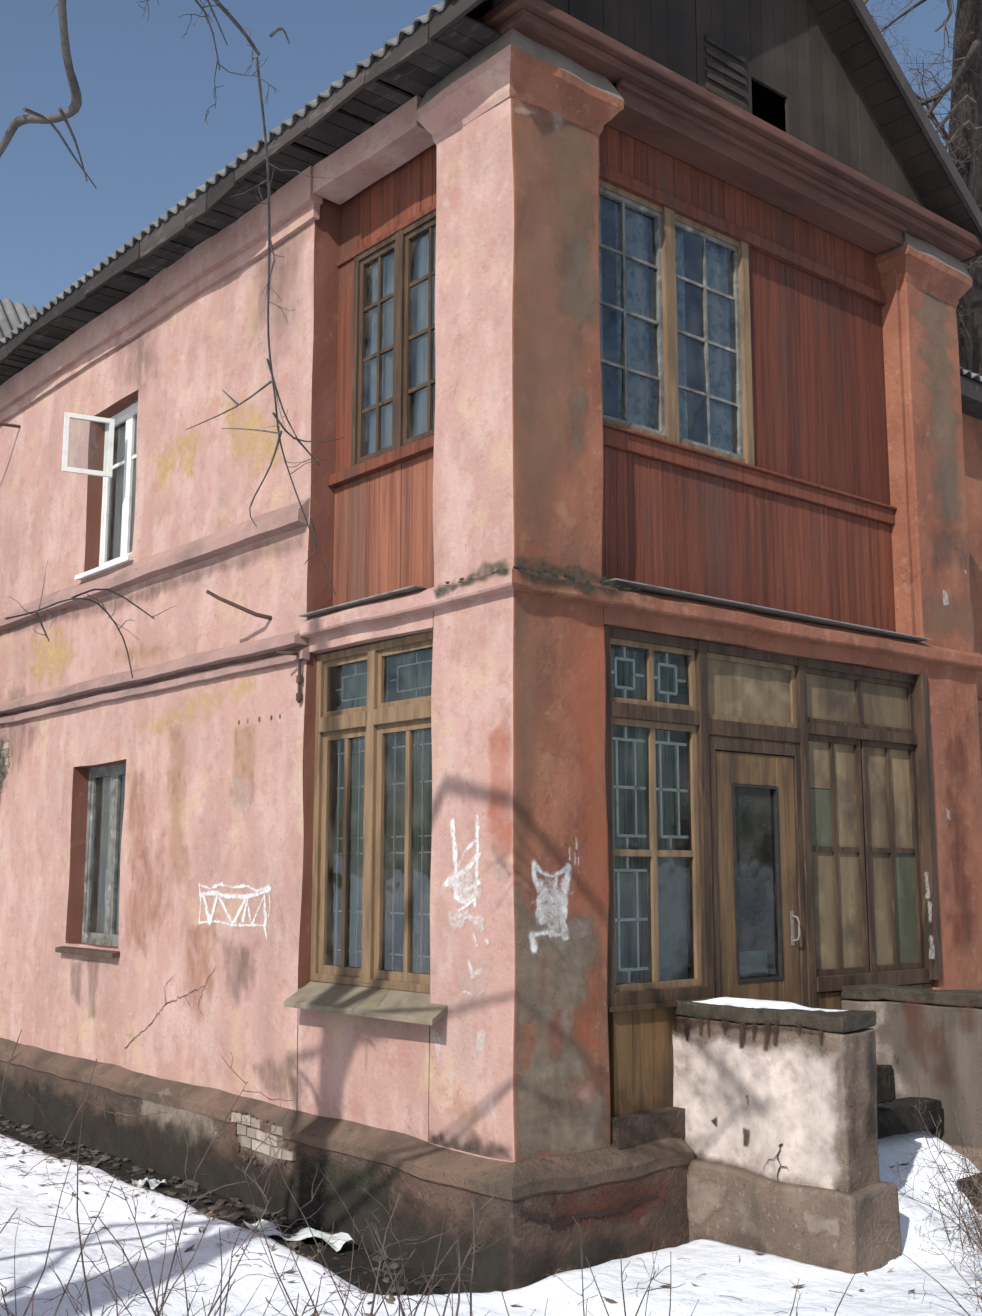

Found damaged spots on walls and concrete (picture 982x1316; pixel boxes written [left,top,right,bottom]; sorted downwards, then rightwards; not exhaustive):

spalling [0,739,10,796]
crack [124,967,215,1048]
water stain [674,1017,823,1050]
spalling [142,1094,216,1144]
spalling [229,1110,296,1171]
water stain [0,1075,644,1294]